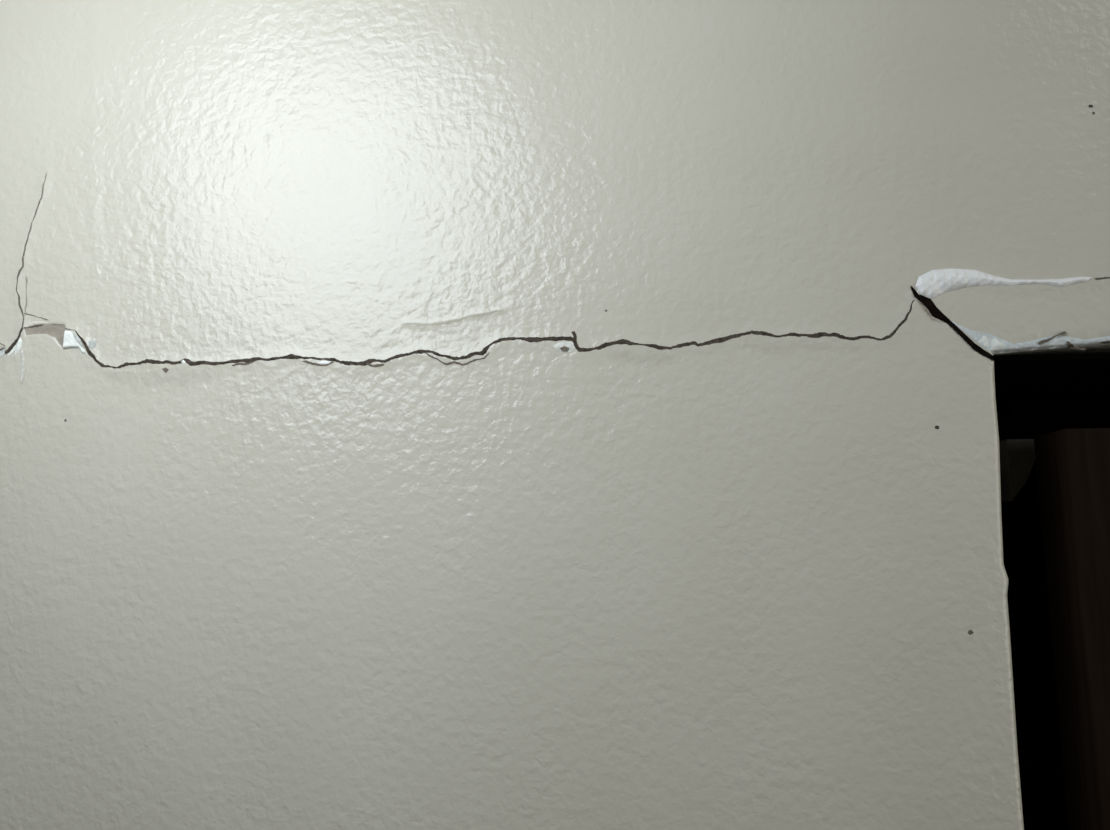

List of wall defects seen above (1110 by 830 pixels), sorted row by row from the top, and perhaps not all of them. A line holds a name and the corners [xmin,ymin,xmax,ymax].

crack [0,173,994,380]
peeling [915,268,1092,299]
spalling [24,321,97,355]
spalling [952,321,1110,354]